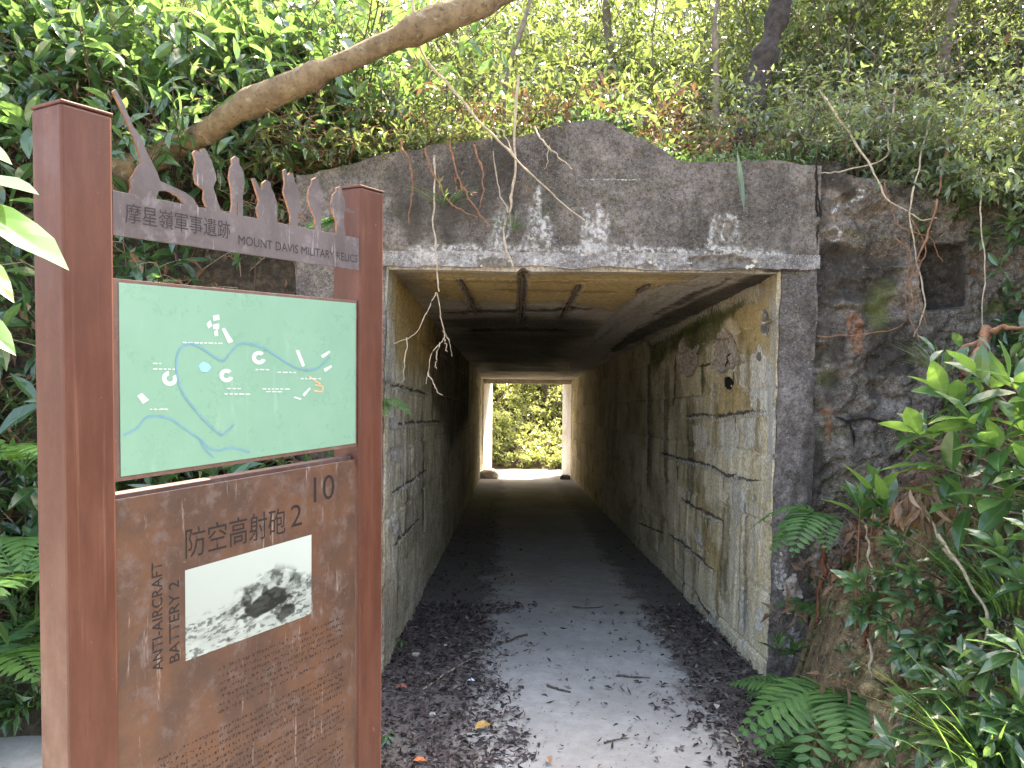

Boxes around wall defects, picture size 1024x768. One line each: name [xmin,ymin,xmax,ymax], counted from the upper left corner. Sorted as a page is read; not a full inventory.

water stain [412,188,779,256]
spalling [516,271,530,323]
rust [394,273,689,418]
crack [638,409,767,625]